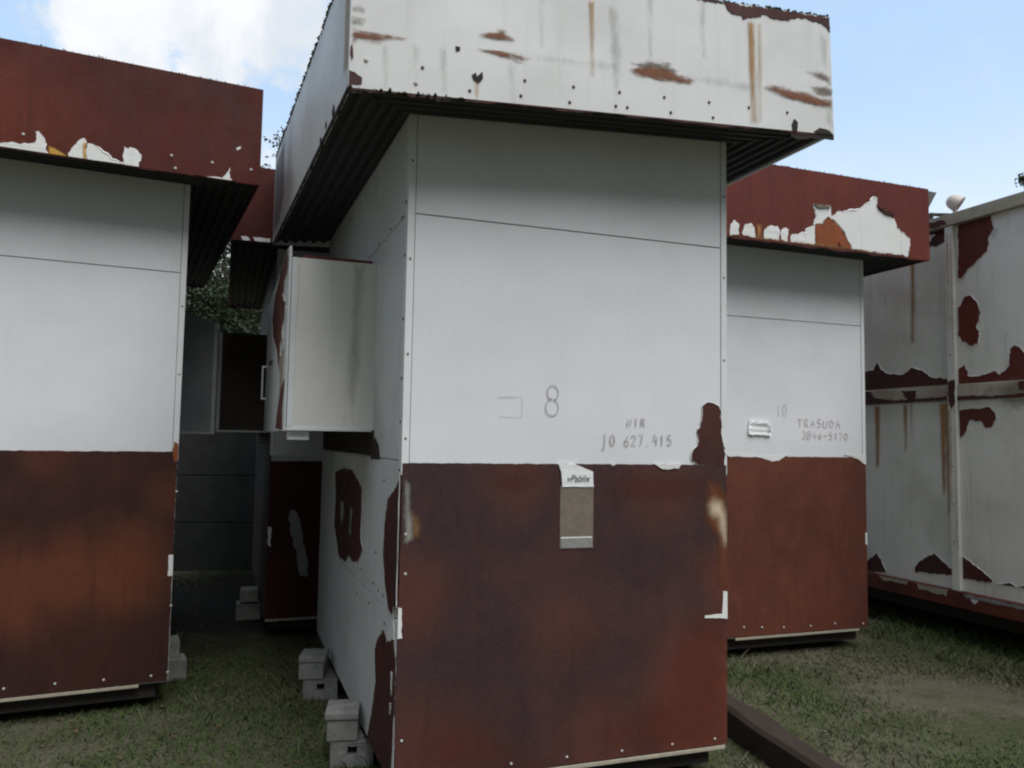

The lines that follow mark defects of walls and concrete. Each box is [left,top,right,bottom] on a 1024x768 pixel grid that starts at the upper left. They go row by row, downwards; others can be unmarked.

peeling [0,131,142,167]
rust [272,0,834,245]
peeling [729,196,911,257]
rust [865,345,1024,499]